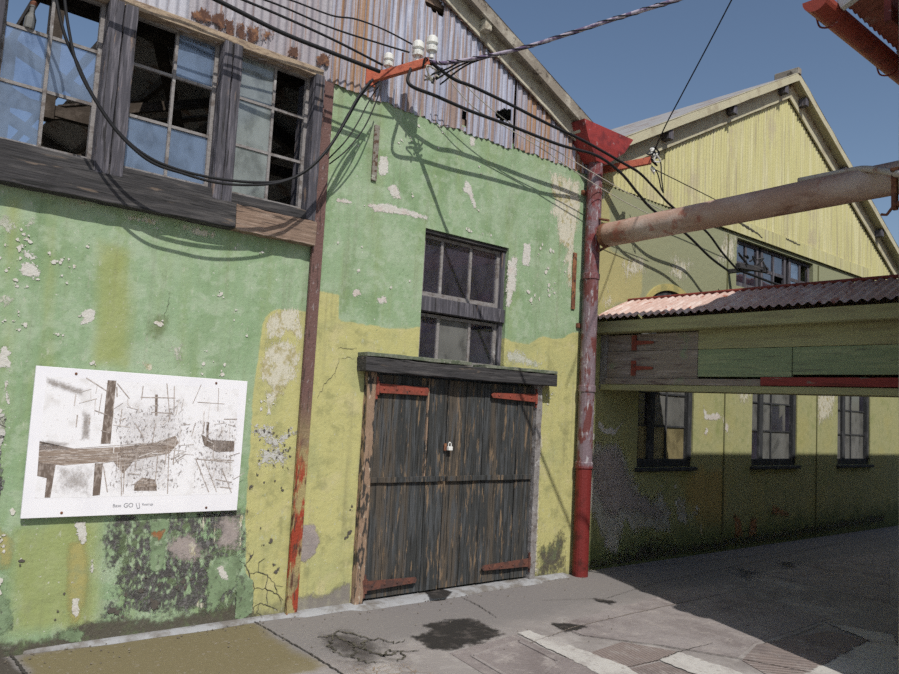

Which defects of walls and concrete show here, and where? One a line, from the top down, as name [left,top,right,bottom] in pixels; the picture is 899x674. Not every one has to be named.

corrosion [191,7,274,44]
corrosion [316,53,331,66]
peeling [378,156,389,176]
peeling [364,185,428,220]
peeling [505,170,581,307]
peeling [249,307,303,491]
peeling [590,412,705,559]
leakage [0,578,14,634]
leakage [103,510,248,618]
crack [242,552,283,615]